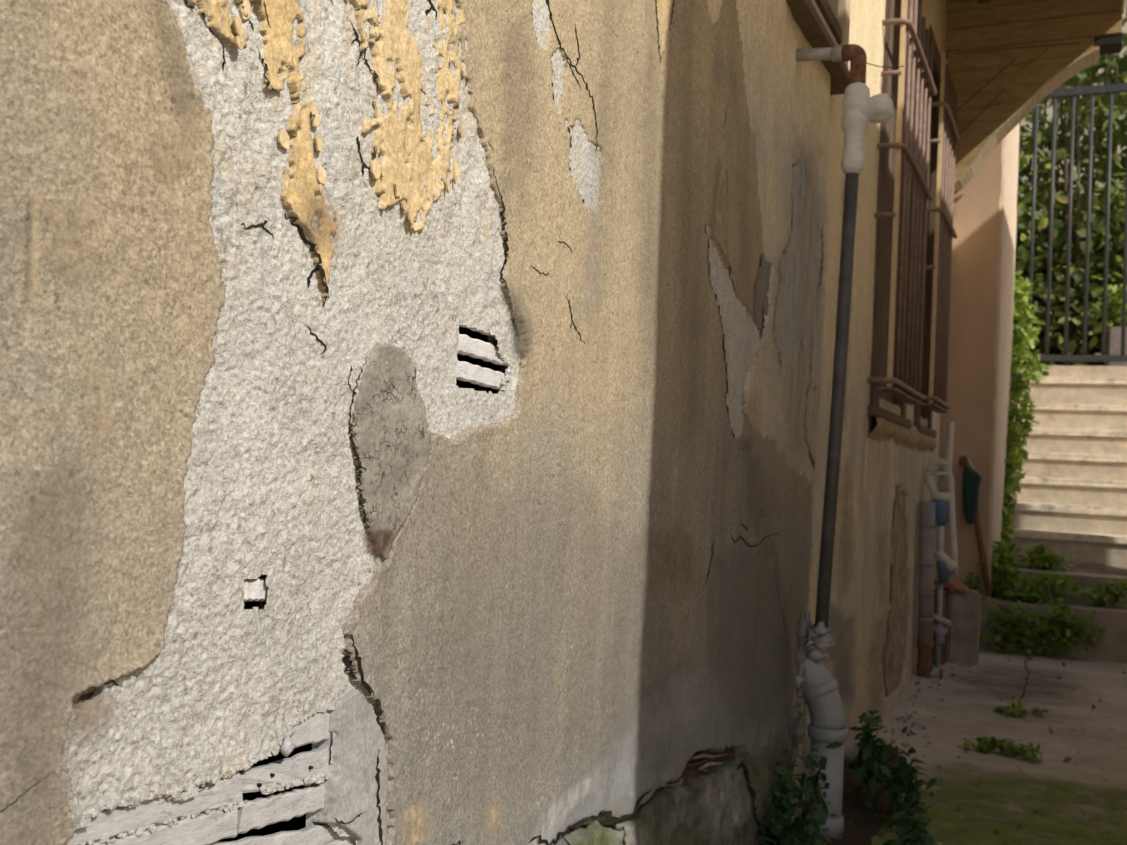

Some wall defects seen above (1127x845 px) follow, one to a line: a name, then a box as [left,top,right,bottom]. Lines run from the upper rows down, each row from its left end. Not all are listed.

crack [547,0,598,150]
crack [241,213,329,354]
crack [348,356,369,537]
peeling [0,0,813,845]
crack [703,509,803,649]
crack [334,634,387,845]
crack [530,772,685,845]
leakage [537,663,792,845]
crack [733,757,762,836]